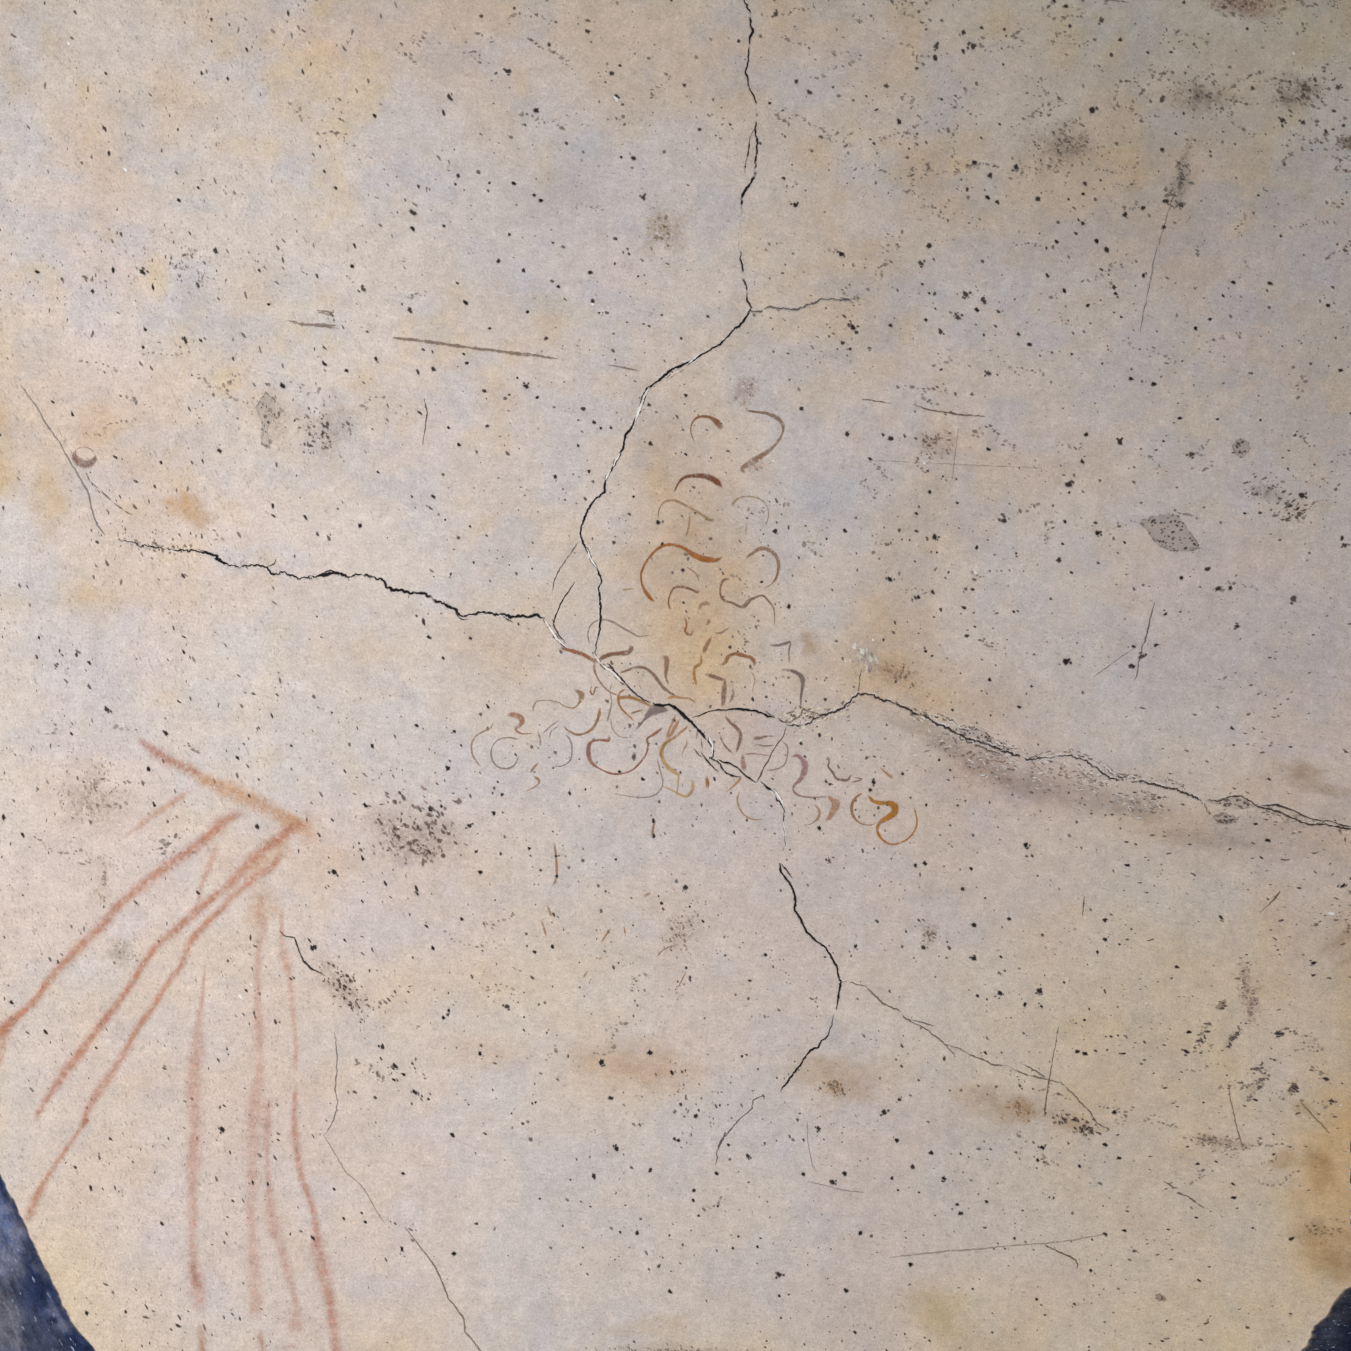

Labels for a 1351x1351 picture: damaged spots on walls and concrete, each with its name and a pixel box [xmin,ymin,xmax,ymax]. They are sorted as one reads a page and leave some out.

crack [741,0,759,205]
crack [1140,191,1175,331]
crack [20,252,1351,1165]